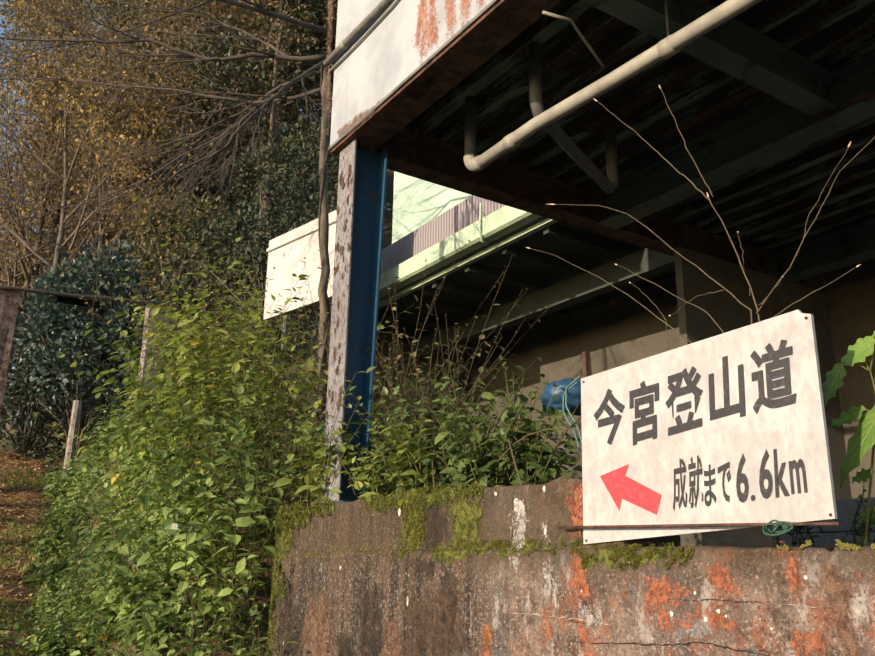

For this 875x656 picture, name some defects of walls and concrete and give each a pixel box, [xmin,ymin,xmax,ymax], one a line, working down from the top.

corrosion [414,0,483,64]
corrosion [565,481,583,537]
water stain [334,583,386,656]
water stain [400,495,464,656]
corrosion [570,549,592,602]
crack [509,612,780,656]
corrosion [639,571,739,634]
corrosion [702,562,744,598]
corrosion [782,549,800,593]
corrosion [789,630,826,656]